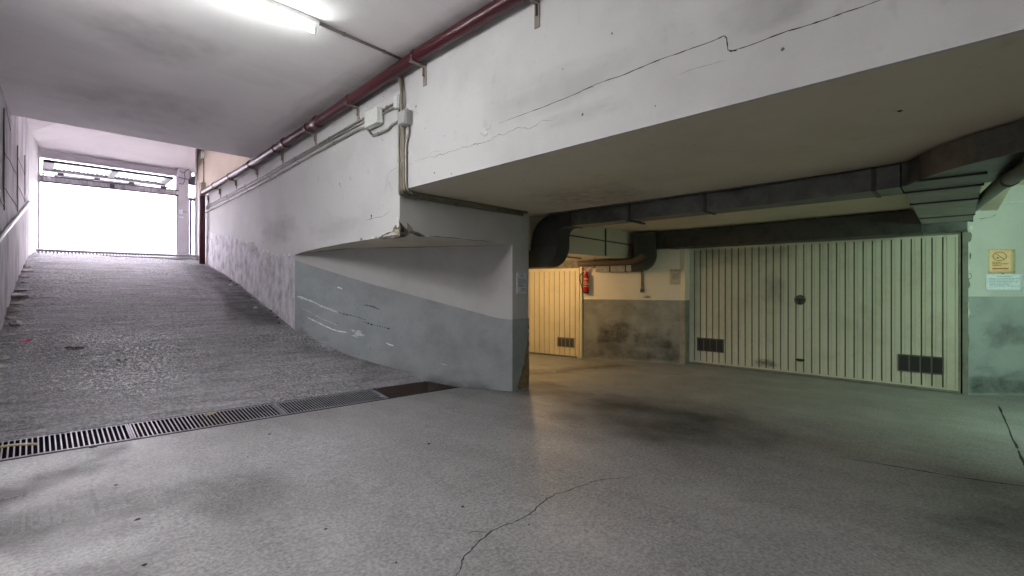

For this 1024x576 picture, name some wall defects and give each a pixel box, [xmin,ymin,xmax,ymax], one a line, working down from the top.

crack [366,0,880,221]
crack [456,474,641,575]